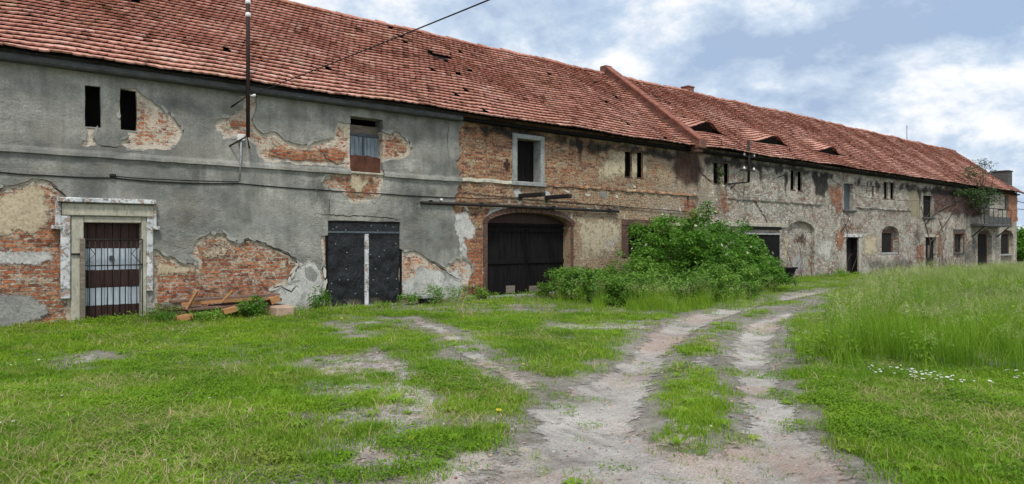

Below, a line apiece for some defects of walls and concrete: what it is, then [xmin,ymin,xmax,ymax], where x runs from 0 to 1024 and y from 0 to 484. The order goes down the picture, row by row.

spalling [80,126,98,147]
spalling [116,88,184,151]
spalling [214,95,412,204]
peeling [598,143,647,188]
spalling [0,178,71,329]
spalling [148,230,327,317]
peeling [570,193,625,266]